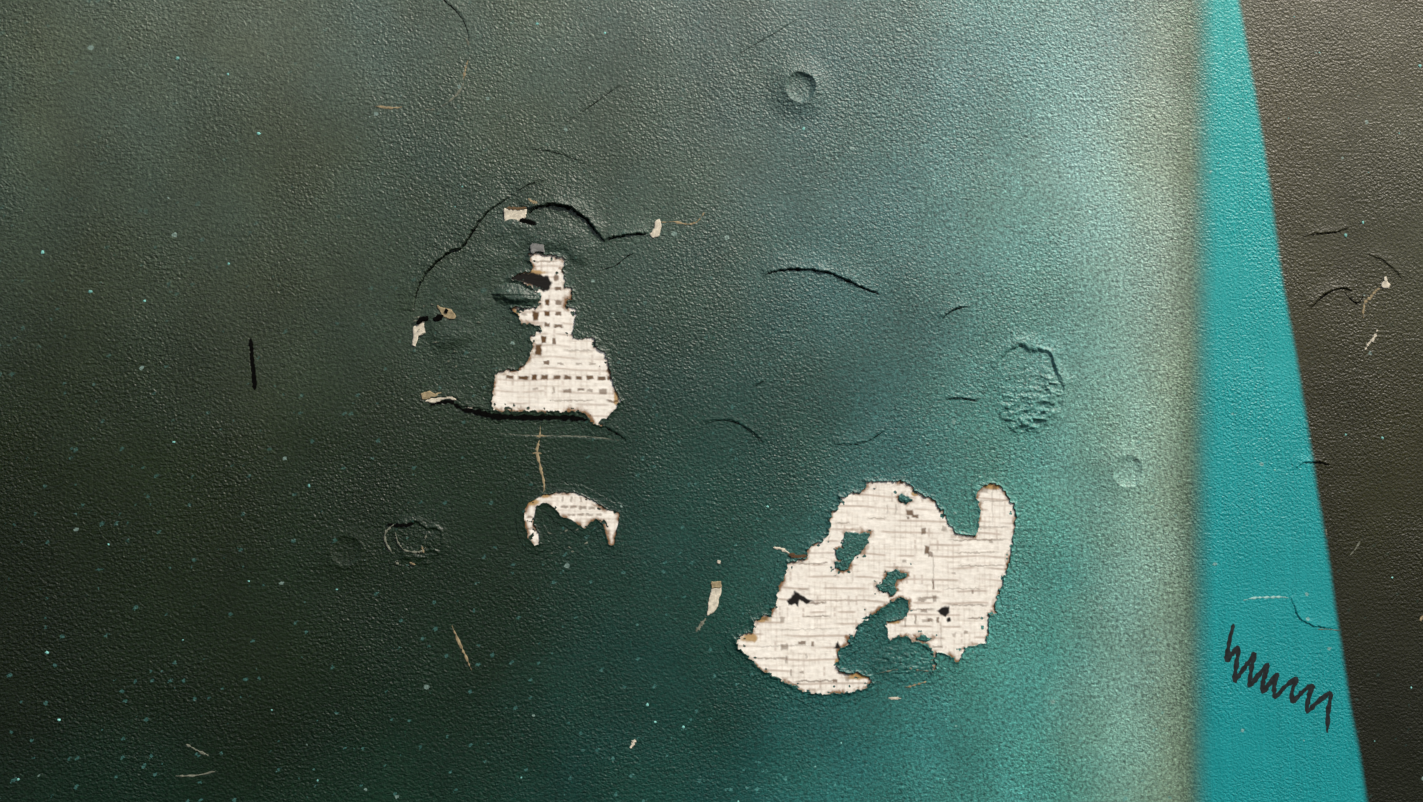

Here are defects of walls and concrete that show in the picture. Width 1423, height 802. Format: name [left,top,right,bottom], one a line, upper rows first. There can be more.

peeling [412,304,456,347]
crack [375,149,650,357]
peeling [503,198,537,225]
crack [758,241,885,295]
crack [1301,215,1409,350]
peeling [421,243,632,556]
peeling [724,469,1027,706]